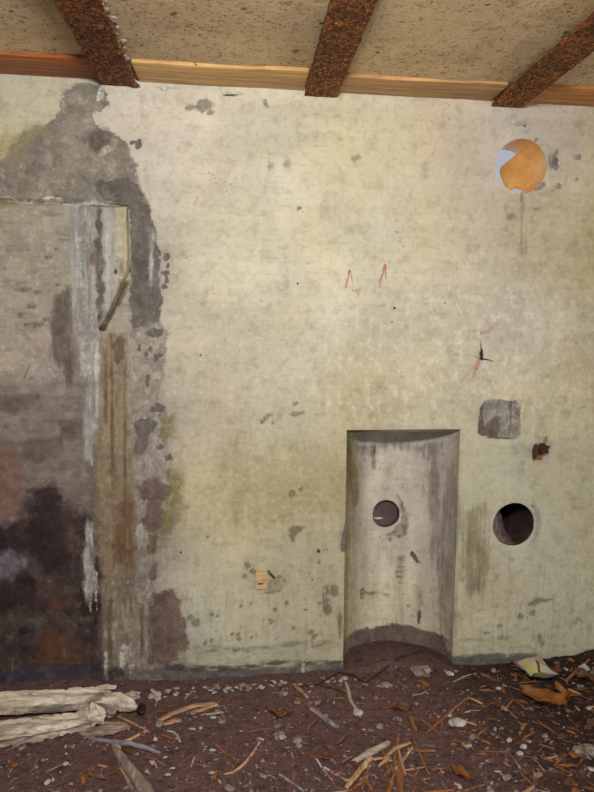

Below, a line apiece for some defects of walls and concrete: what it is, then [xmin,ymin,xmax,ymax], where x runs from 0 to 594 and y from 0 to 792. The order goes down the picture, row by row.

leakage [0,195,545,683]
peeling [478,399,521,439]
corrosion [532,436,551,460]